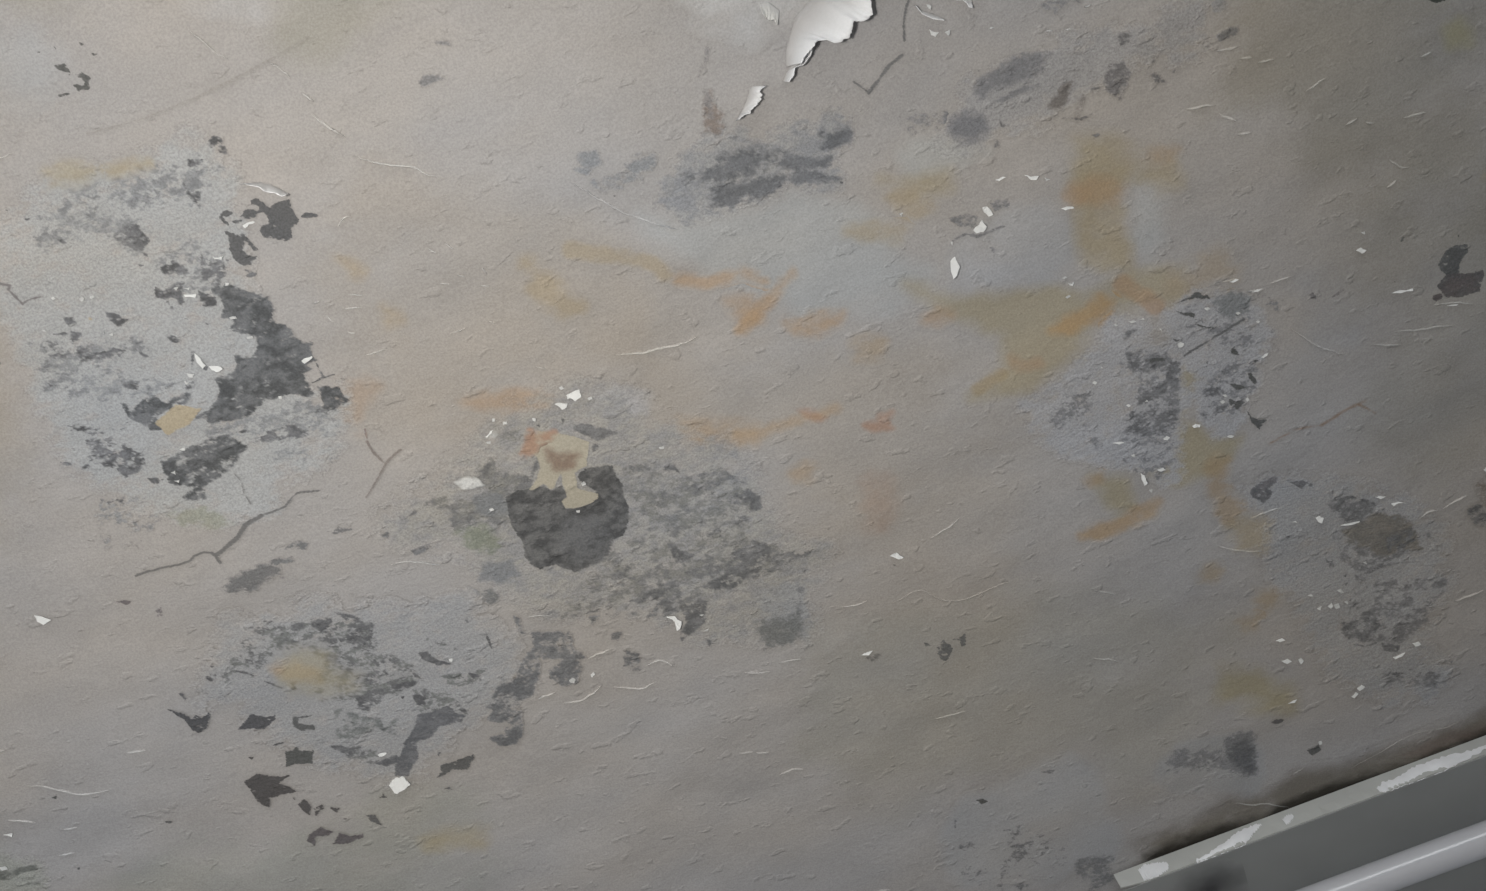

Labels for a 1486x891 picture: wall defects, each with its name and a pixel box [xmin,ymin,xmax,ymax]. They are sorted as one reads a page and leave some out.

peeling [759,0,873,82]
peeling [914,4,950,37]
peeling [736,86,766,121]
rust [837,183,943,250]
peeling [0,122,360,552]
rust [1042,271,1164,340]
peeling [1432,235,1484,306]
peeling [1014,279,1284,493]
rust [1073,494,1167,544]
peeling [167,370,843,846]
peeling [1229,468,1486,711]